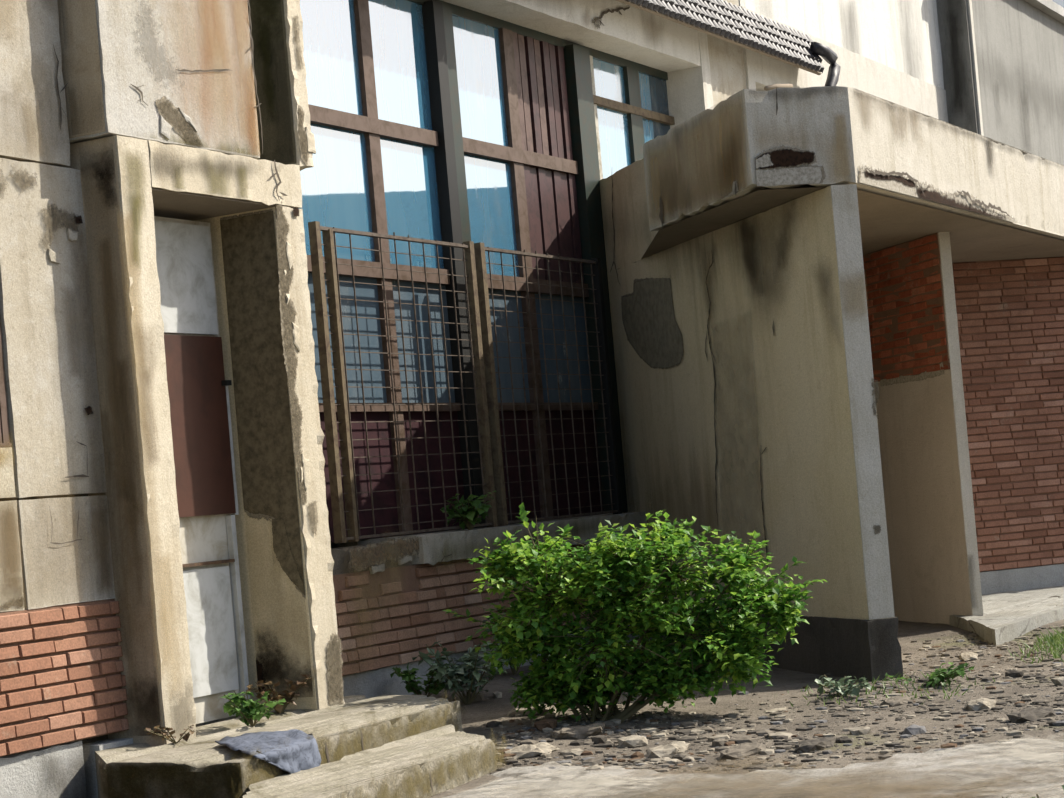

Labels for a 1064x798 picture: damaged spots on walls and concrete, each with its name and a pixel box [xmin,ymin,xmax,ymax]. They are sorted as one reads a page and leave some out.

crack [592,7,630,25]
spalling [156,96,202,146]
crack [176,0,288,201]
spalling [755,146,826,186]
spalling [859,165,1015,223]
spalling [42,203,83,264]
peeling [220,201,318,599]
crack [705,250,718,523]
leakage [256,637,313,697]
spalling [325,633,344,705]